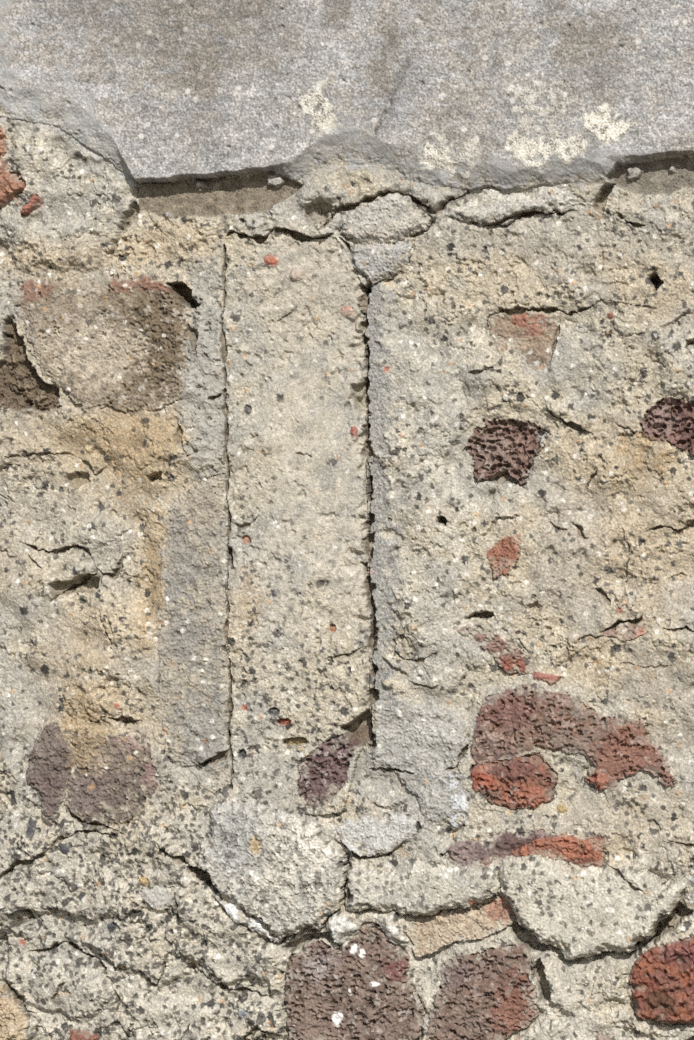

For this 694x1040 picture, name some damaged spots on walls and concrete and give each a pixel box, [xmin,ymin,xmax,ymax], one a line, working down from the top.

peeling [418,132,478,178]
peeling [505,103,636,173]
spalling [606,156,694,197]
spalling [110,172,303,258]
crack [226,191,473,244]
crack [483,209,579,228]
crack [486,299,657,353]
spalling [0,315,62,415]
spalling [340,709,375,749]
crack [0,806,126,879]
crack [157,845,202,873]
crack [28,940,121,1015]